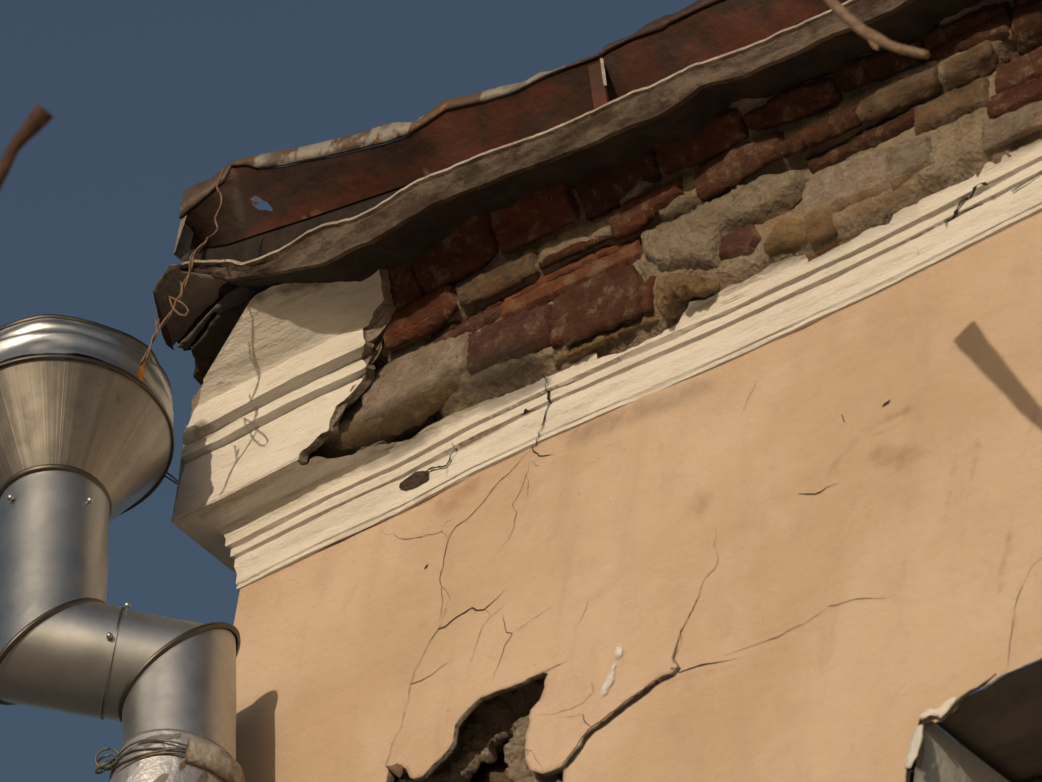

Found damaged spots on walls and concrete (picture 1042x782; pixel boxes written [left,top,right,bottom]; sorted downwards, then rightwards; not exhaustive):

spalling [305,0,1042,465]
crack [945,172,1042,226]
spalling [190,386,202,418]
crack [388,376,553,684]
spalling [387,678,563,782]
crack [528,595,895,767]
peeling [904,673,996,782]